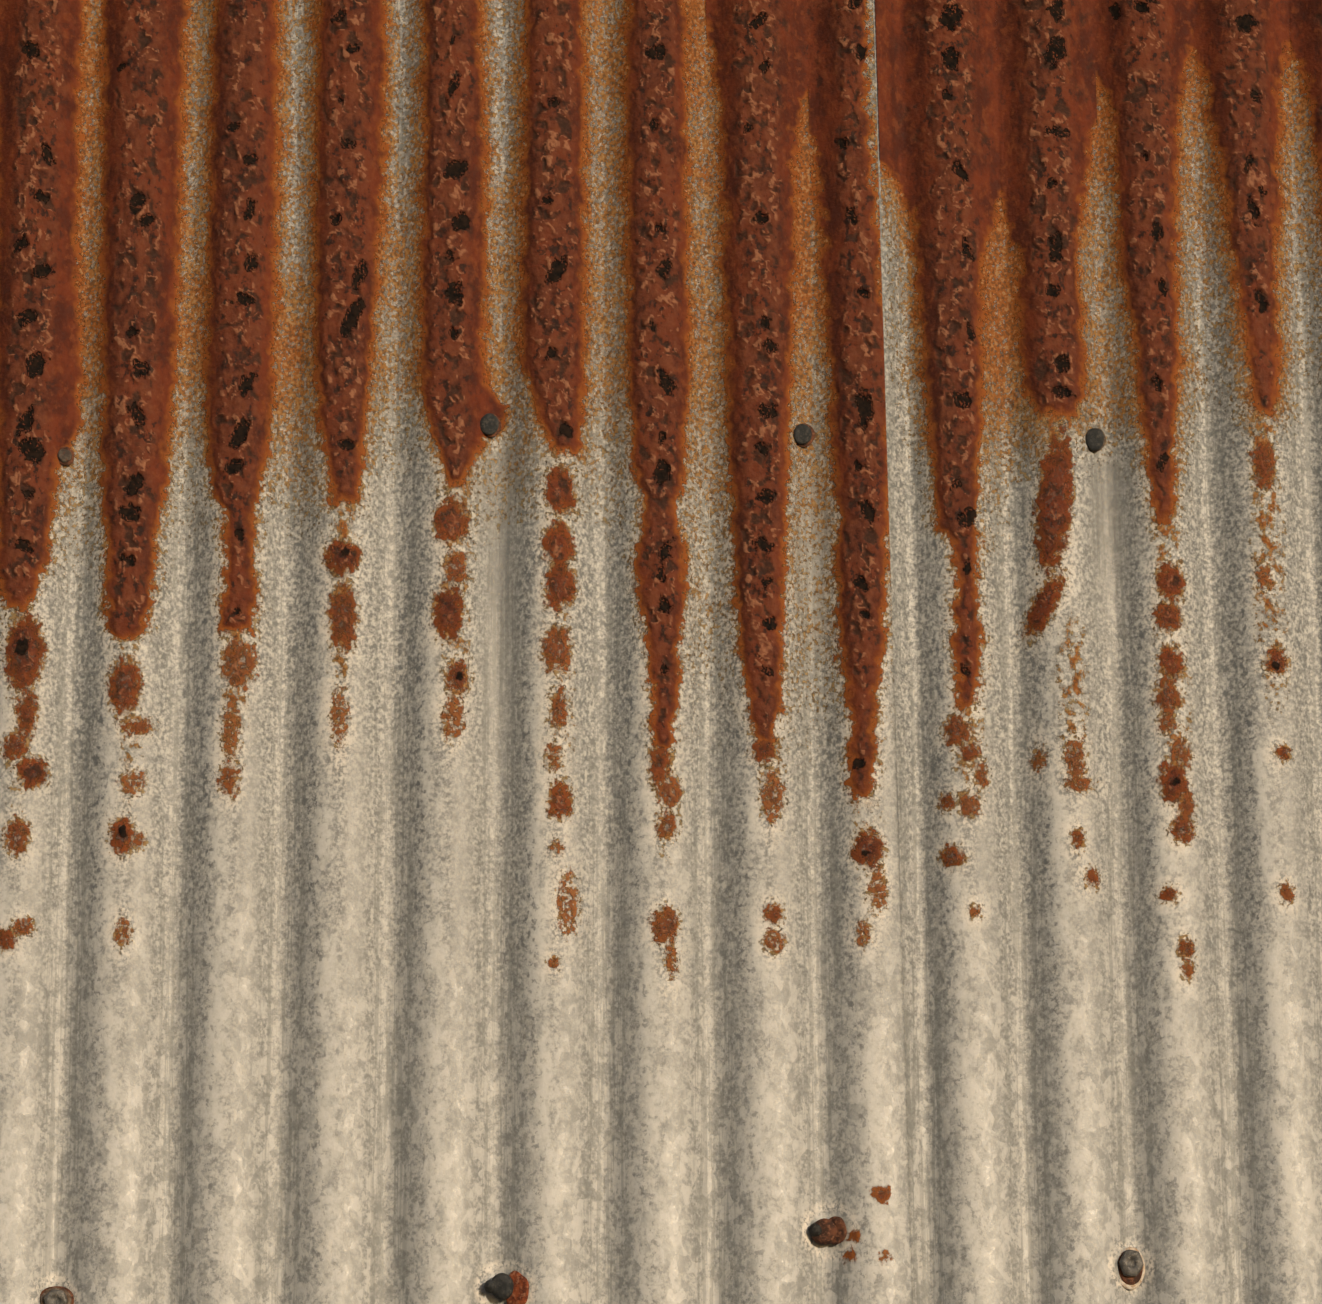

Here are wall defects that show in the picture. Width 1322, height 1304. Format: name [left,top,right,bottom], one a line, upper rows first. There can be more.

rust [0,0,1322,952]
rust [0,914,38,954]
rust [545,955,561,972]
rust [649,901,683,981]
rust [759,898,788,958]
rust [1175,933,1198,984]
rust [870,1185,891,1205]
rust [843,1230,861,1264]